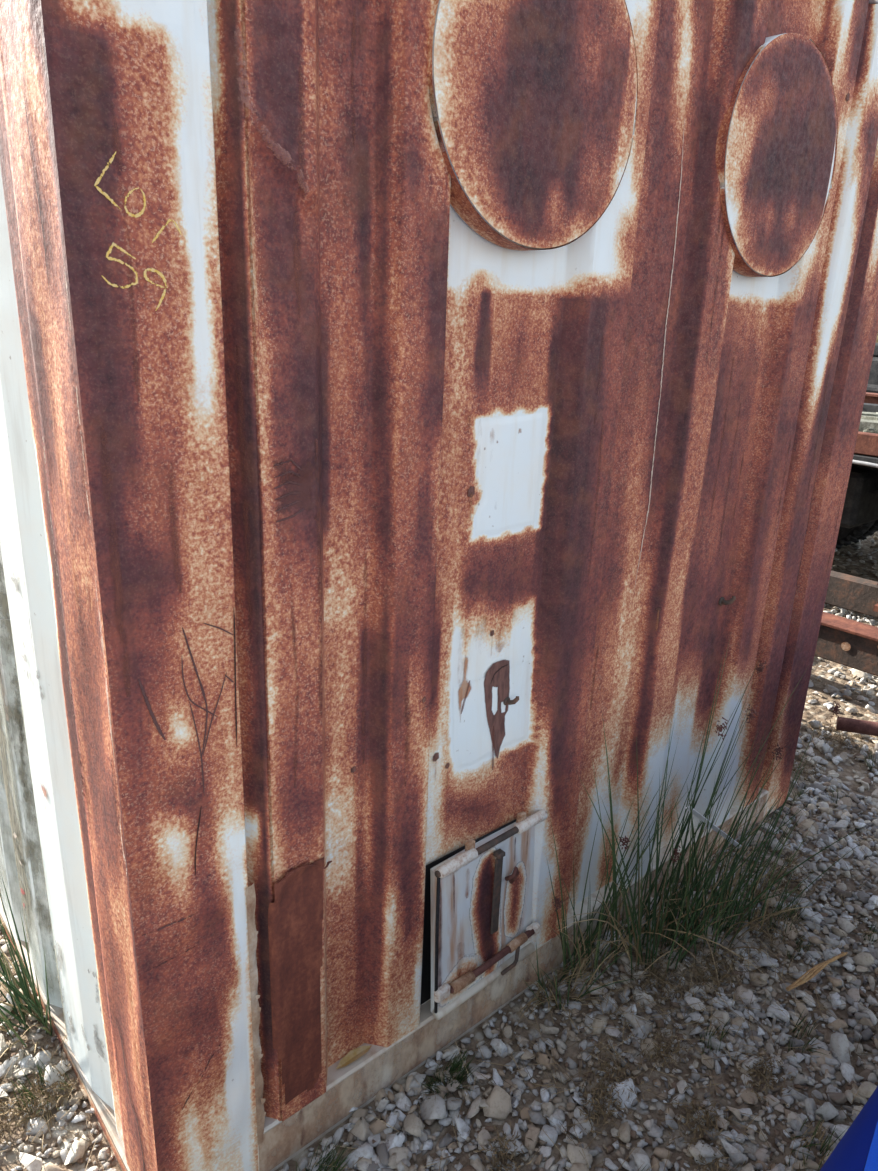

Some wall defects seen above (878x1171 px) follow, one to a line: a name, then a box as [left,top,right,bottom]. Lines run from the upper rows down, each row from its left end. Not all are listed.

water stain [0,564,13,643]
water stain [0,676,51,940]
rust [0,0,396,1171]
rust [378,0,878,1048]